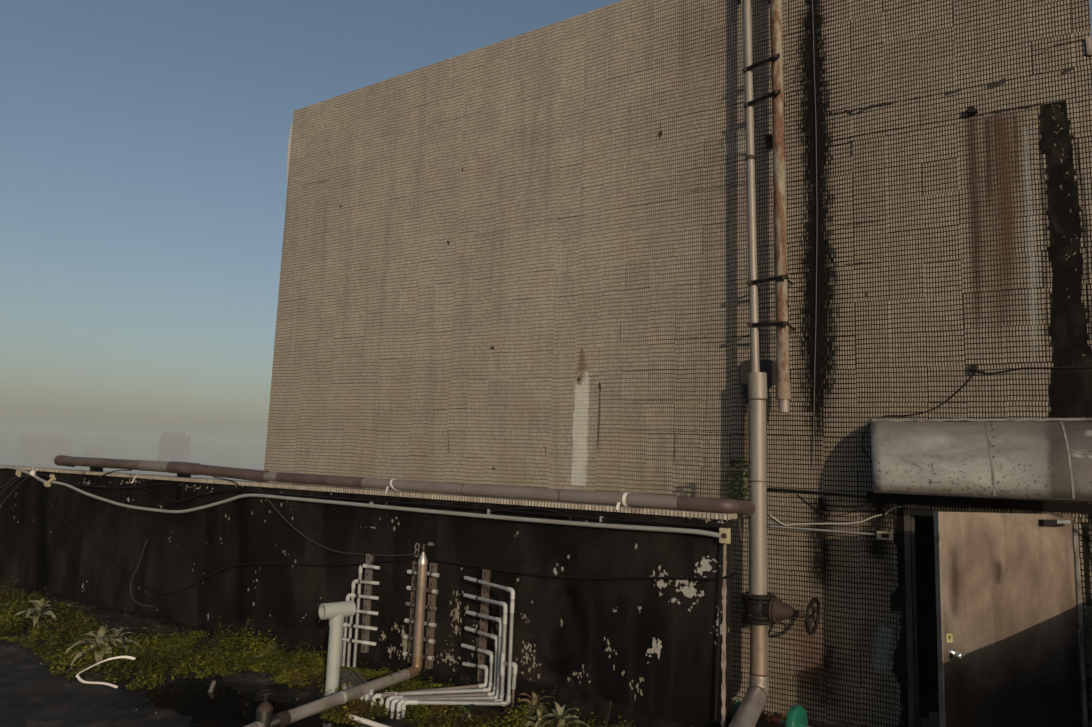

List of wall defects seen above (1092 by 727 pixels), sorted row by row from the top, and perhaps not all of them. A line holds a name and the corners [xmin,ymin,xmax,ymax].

damp [783,0,867,452]
corrosion [969,119,990,297]
damp [1036,133,1051,346]
damp [1072,133,1092,350]
peeling [604,637,644,700]
peeling [646,637,662,664]
peeling [650,556,722,636]
spalling [890,494,909,727]